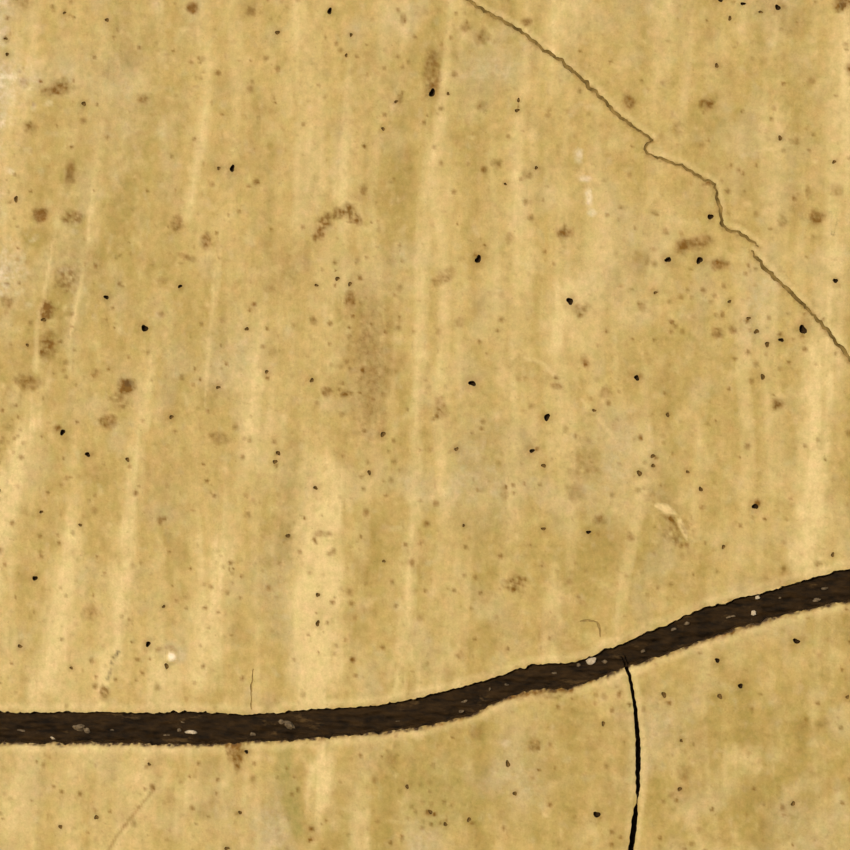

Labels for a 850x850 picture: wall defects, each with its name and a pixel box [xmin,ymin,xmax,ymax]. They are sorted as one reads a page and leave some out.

crack [466,0,850,362]
crack [0,569,850,850]